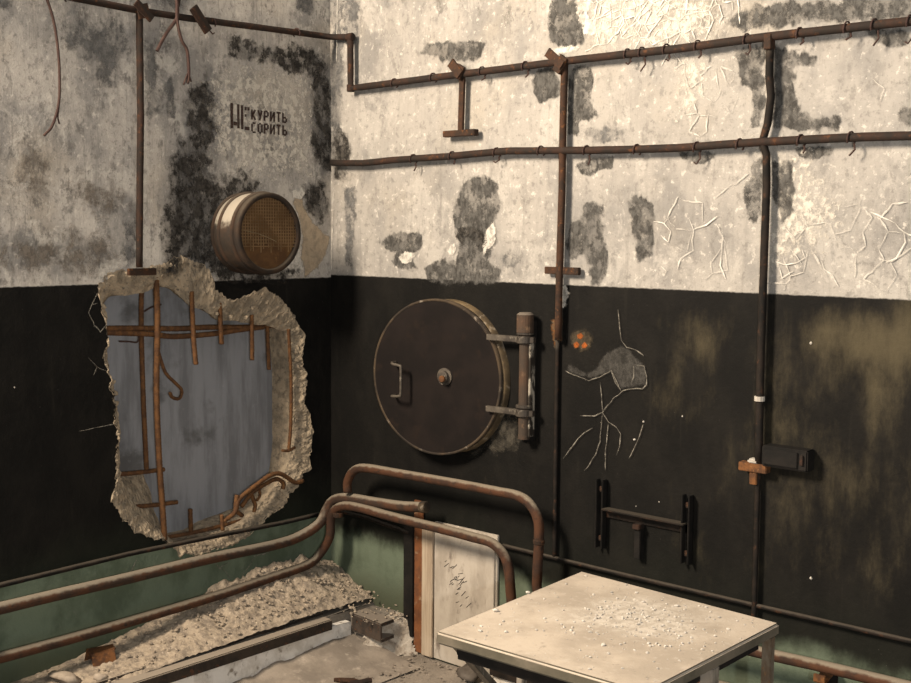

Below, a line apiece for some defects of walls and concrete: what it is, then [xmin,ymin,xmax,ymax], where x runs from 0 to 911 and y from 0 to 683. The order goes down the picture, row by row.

water stain [730,0,911,47]
water stain [145,41,215,134]
crack [585,0,740,137]
water stain [737,46,841,132]
water stain [203,252,299,284]
water stain [383,176,516,285]
water stain [566,202,608,285]
water stain [743,159,794,223]
water stain [796,146,831,160]
crack [774,202,911,290]
spalling [98,254,314,558]